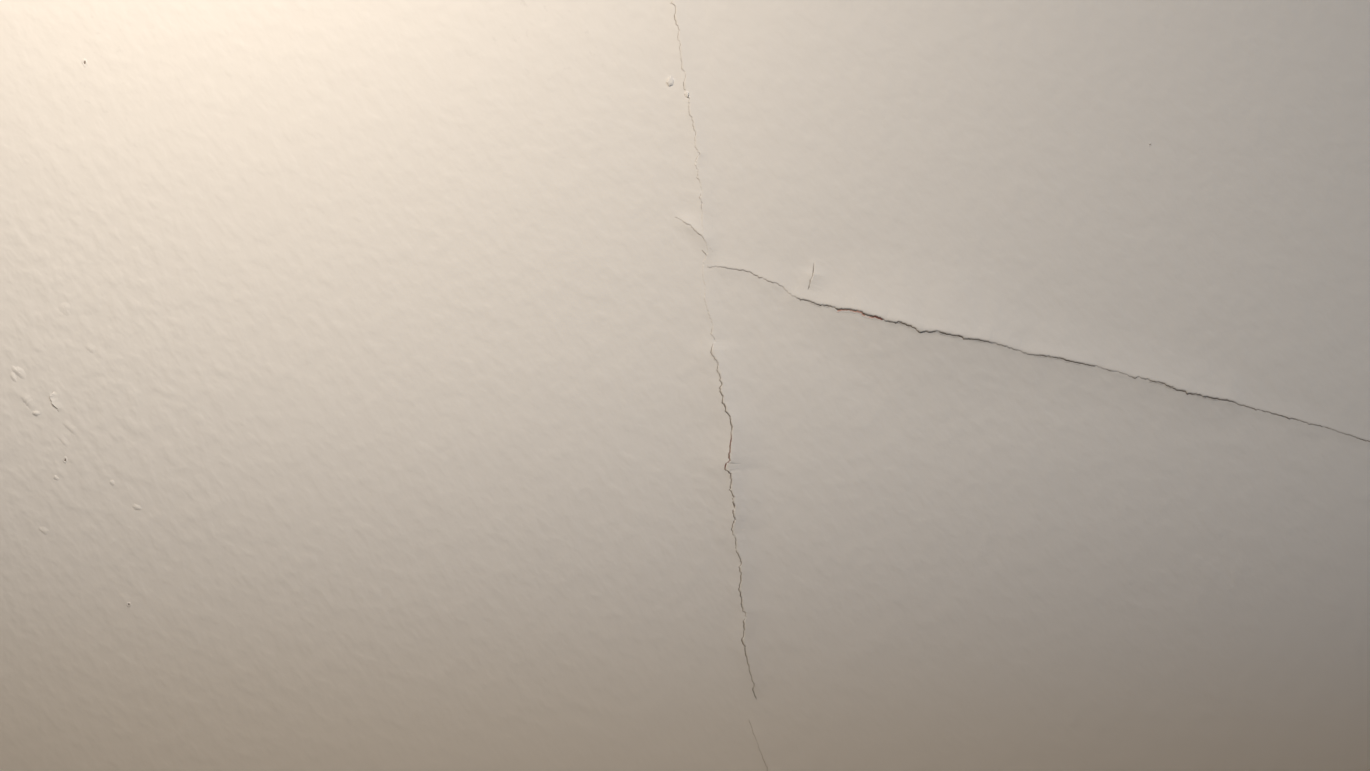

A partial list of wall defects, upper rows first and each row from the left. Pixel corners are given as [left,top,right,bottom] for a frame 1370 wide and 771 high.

crack [671,0,1370,771]